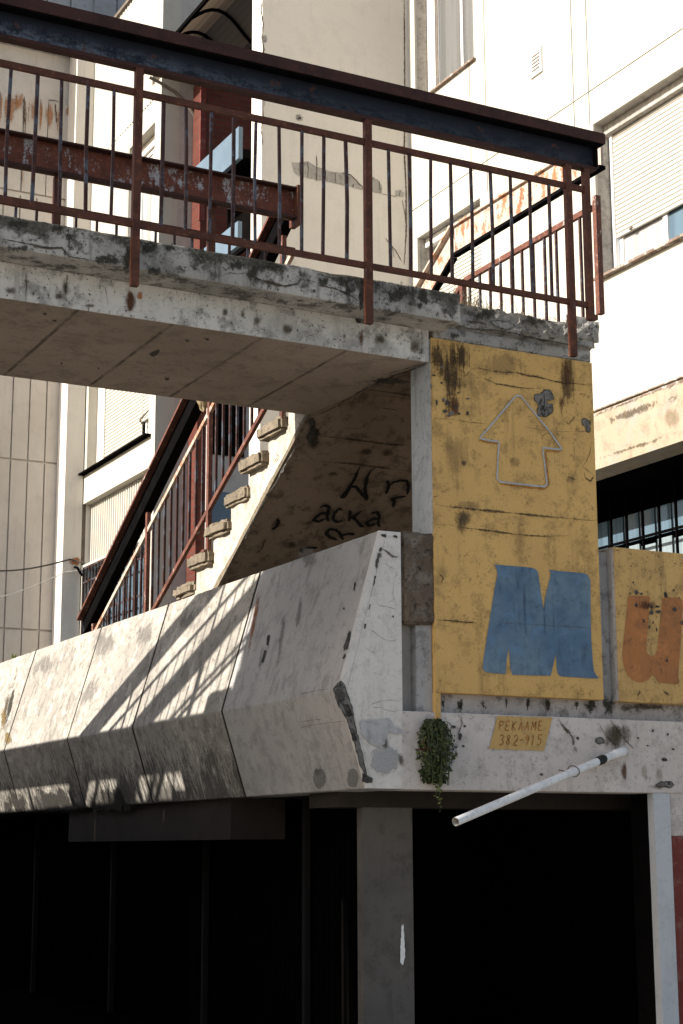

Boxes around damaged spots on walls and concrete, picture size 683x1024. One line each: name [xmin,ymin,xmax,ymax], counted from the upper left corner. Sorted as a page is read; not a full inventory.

rust [0,95,69,129]
peeling [292,155,404,197]
spalling [333,681,373,783]